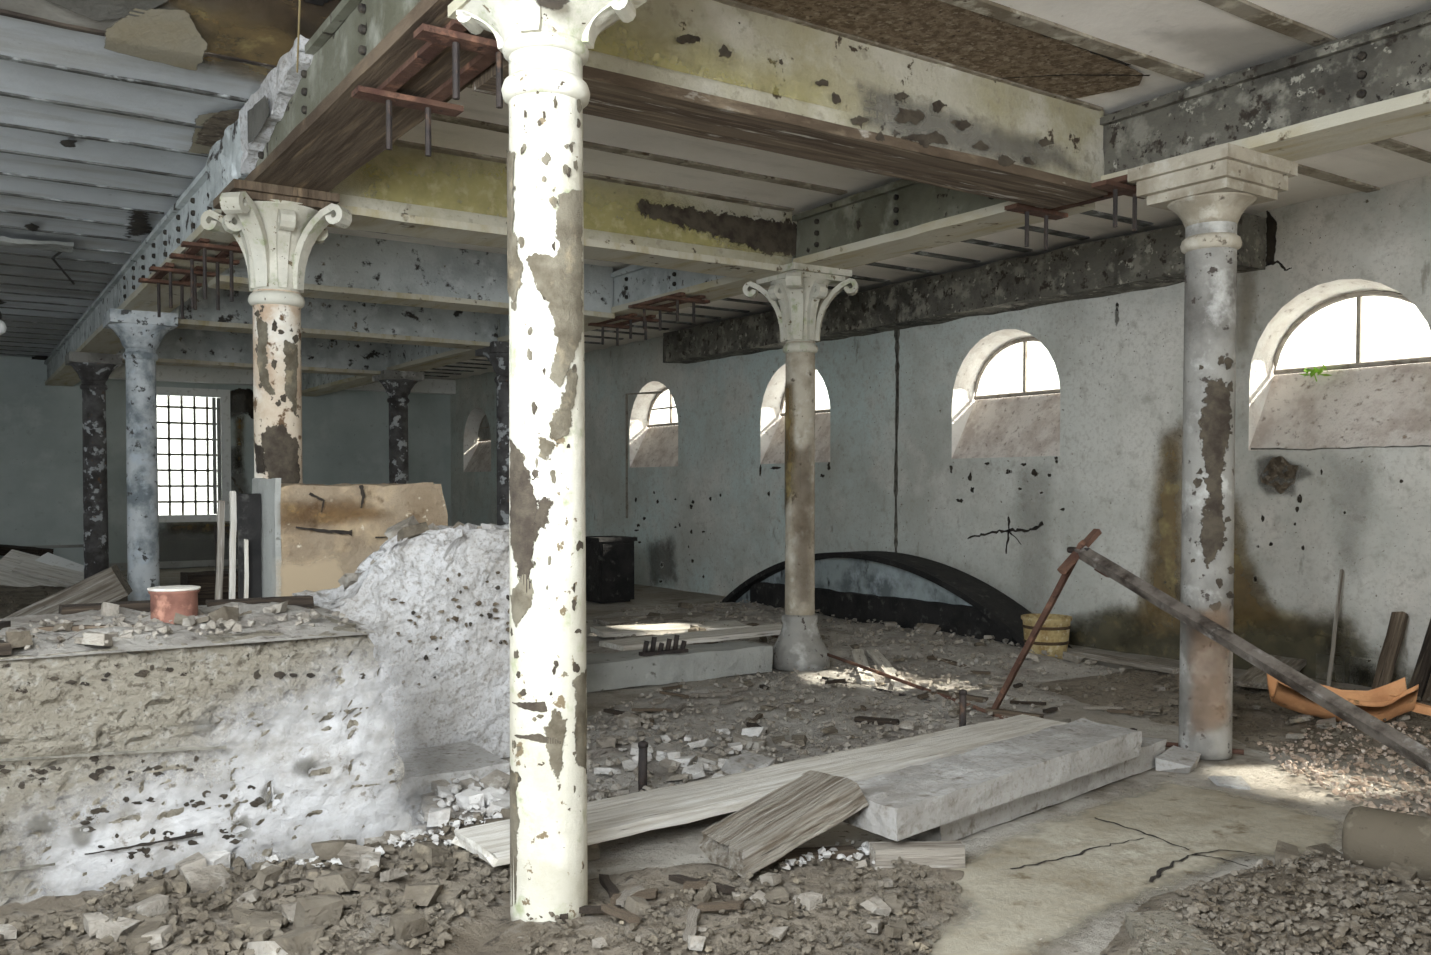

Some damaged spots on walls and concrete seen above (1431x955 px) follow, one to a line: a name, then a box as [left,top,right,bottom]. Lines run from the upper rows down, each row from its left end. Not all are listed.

peeling [46,0,207,71]
spalling [735,0,1150,99]
damp [60,139,77,147]
peeling [637,198,797,256]
peeling [230,310,300,484]
peeling [424,99,587,793]
damp [1069,429,1182,660]
peeling [1191,355,1235,613]
damp [1233,504,1376,687]
damp [1391,672,1412,689]
peeling [510,767,521,910]
crack [1010,817,1256,882]